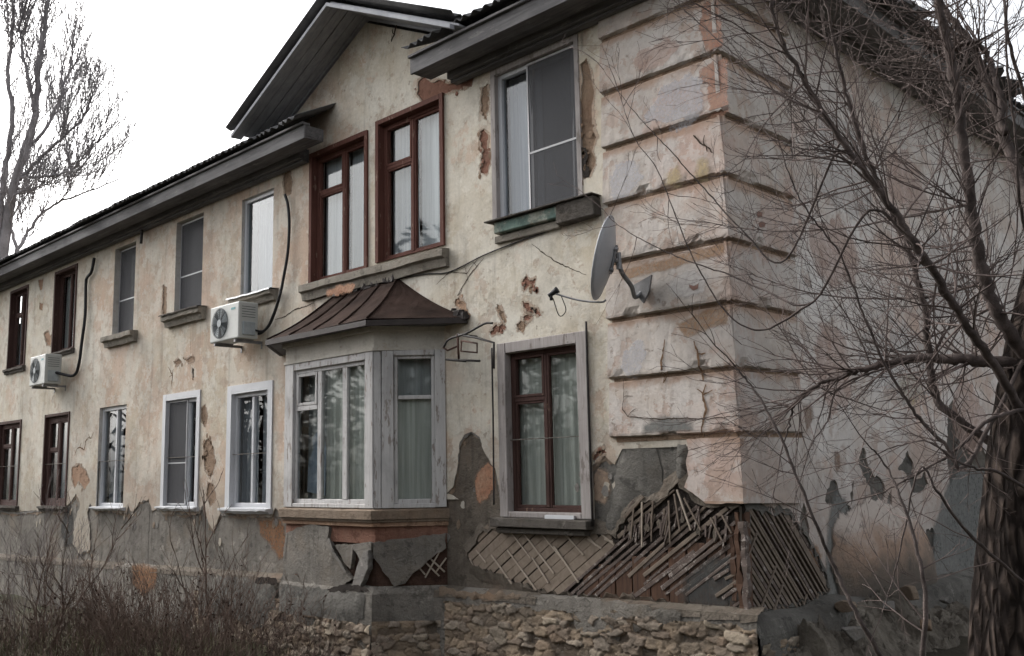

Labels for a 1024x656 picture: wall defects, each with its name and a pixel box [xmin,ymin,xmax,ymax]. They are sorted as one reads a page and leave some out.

flaking render [415,77,491,179]
flaking render [579,58,599,183]
flaking render [489,276,541,337]
flaking render [175,355,195,380]
crack [622,339,744,436]
flaking render [0,405,667,603]
flaking render [589,445,830,613]
flaking render [825,480,837,504]
flaking render [859,449,890,504]
flaking render [898,452,927,493]